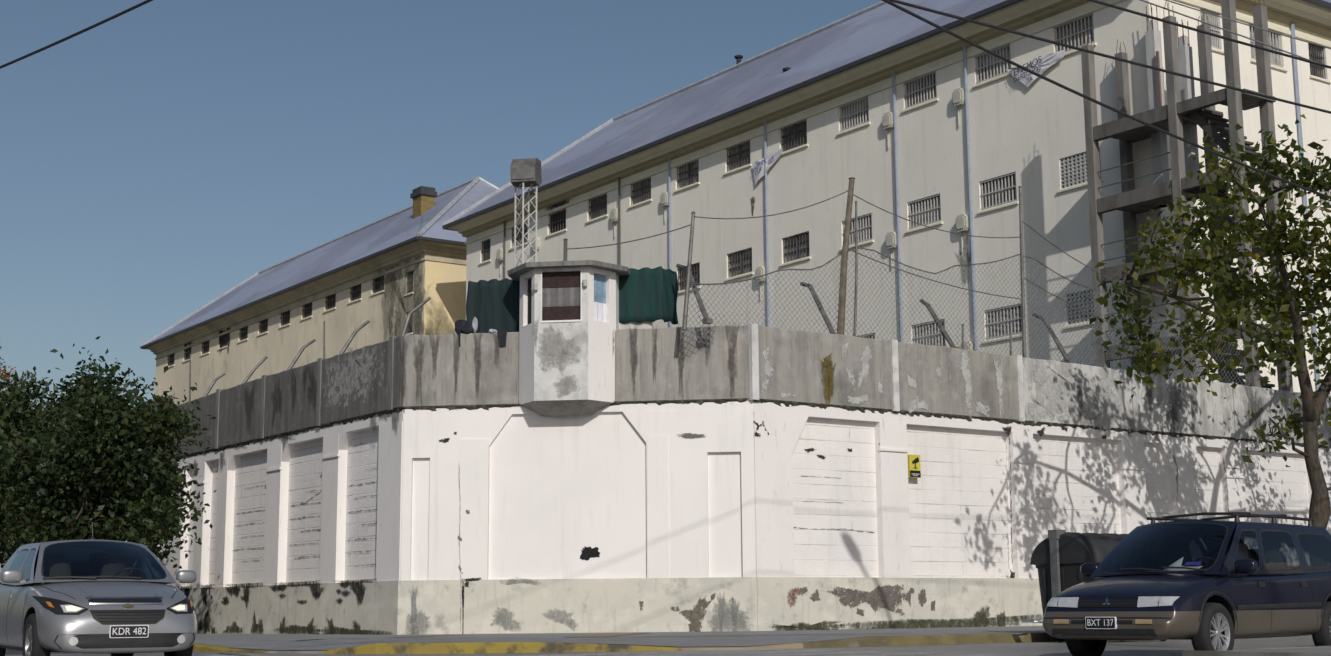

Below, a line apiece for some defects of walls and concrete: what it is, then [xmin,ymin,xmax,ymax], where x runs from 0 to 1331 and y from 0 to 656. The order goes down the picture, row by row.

leakage [381,269,459,395]
leakage [475,335,500,391]
flaking render [671,593,716,632]
flaking render [794,584,936,616]